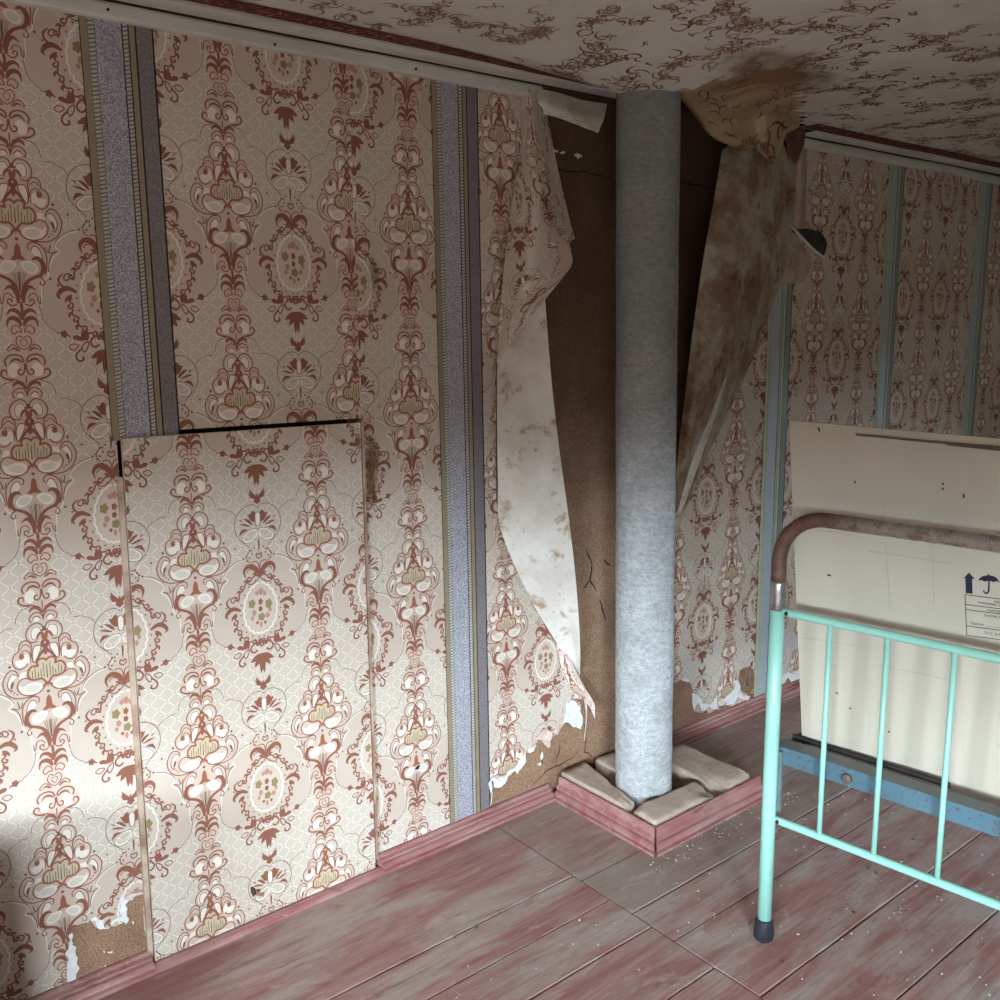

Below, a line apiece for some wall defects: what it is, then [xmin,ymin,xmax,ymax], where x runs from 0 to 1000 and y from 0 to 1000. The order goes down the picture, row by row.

damp [715,53,827,91]
peeling [676,138,728,470]
peeling [490,88,616,806]
crack [584,549,611,622]
peeling [672,667,754,731]
peeling [65,892,147,982]